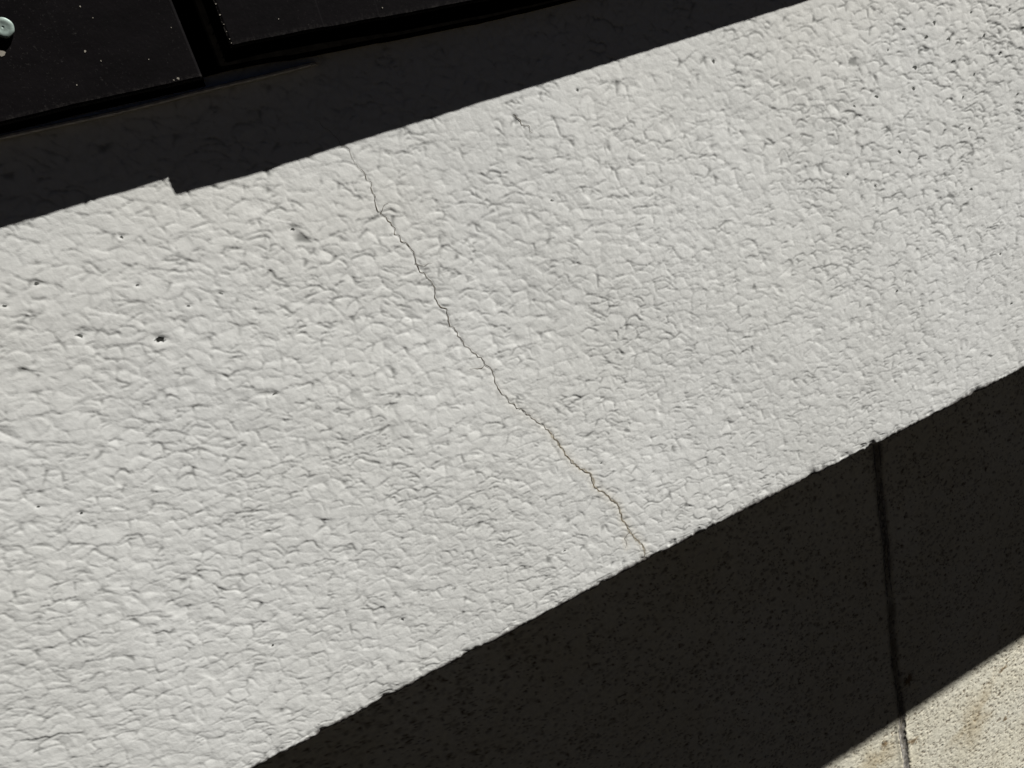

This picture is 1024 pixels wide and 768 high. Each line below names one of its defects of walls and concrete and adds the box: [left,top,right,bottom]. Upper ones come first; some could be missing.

crack [317,120,646,558]